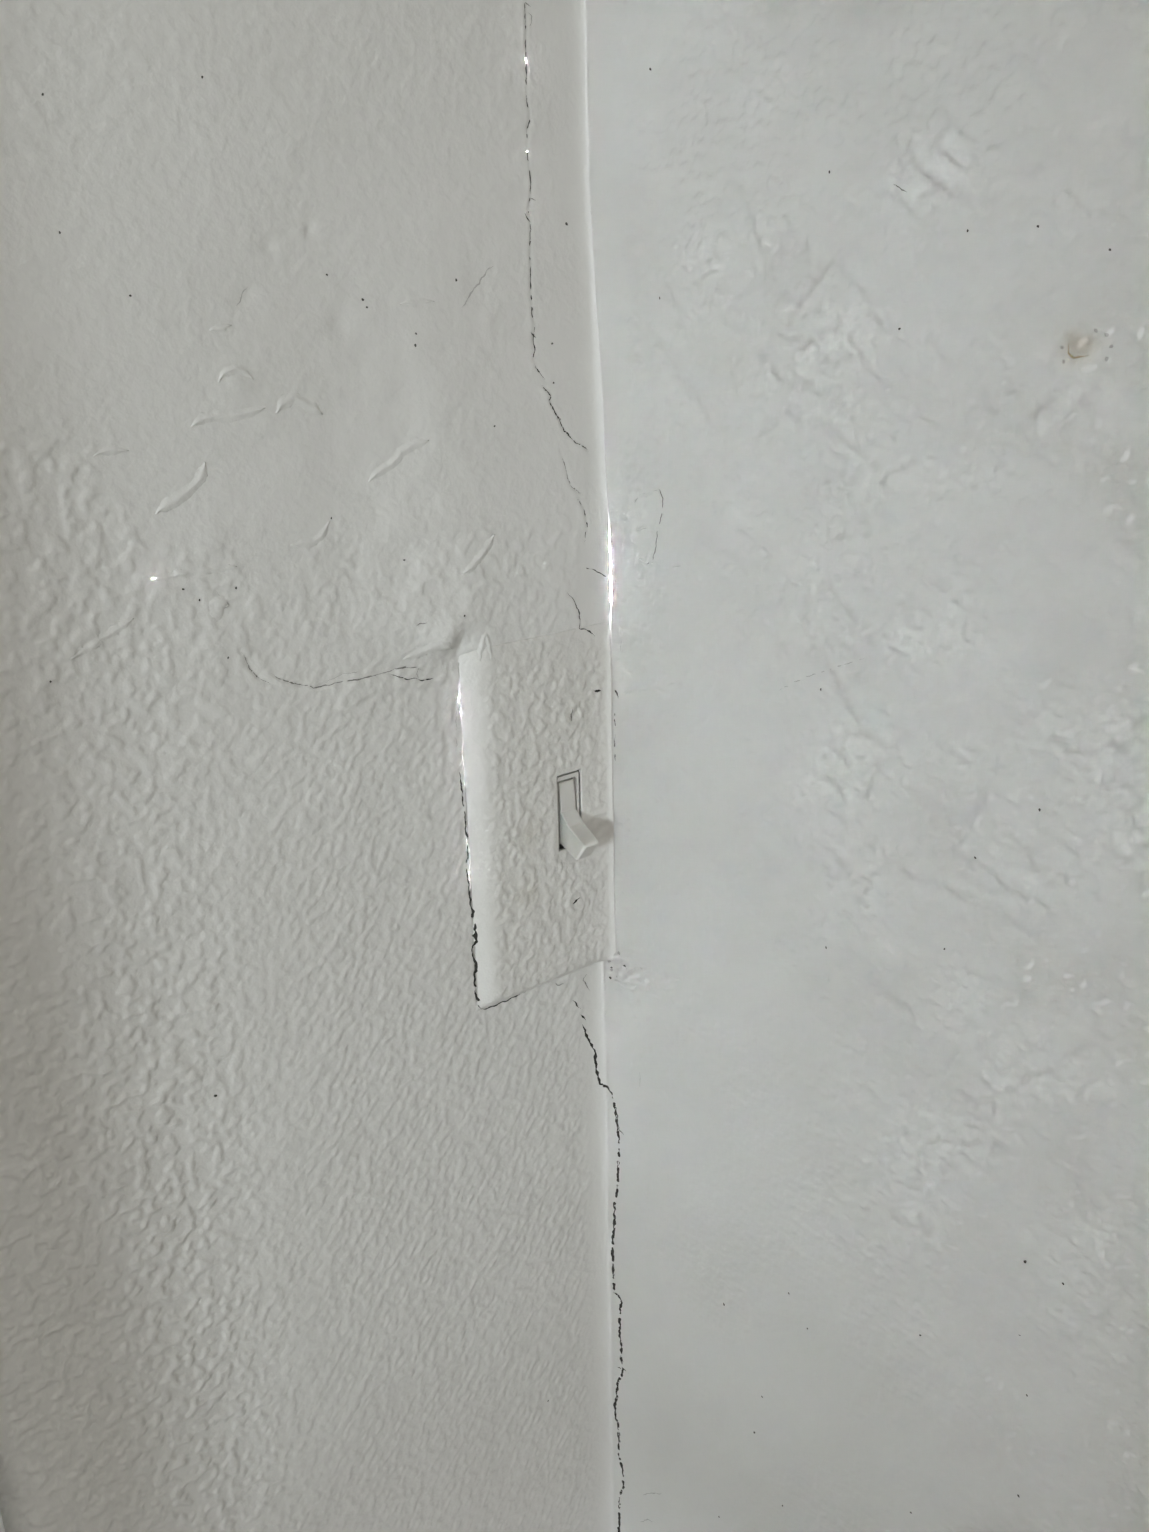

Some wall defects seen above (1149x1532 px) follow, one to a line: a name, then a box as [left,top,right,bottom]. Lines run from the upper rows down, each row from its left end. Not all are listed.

crack [524,2,621,747]
crack [242,653,626,1532]